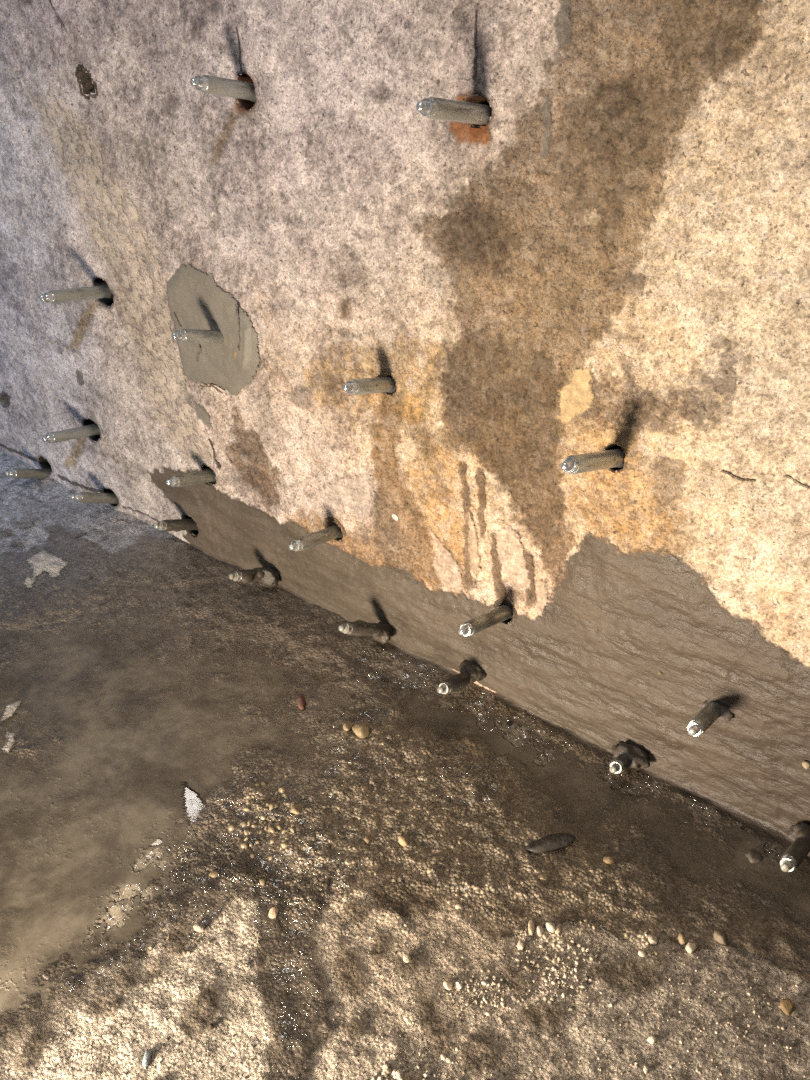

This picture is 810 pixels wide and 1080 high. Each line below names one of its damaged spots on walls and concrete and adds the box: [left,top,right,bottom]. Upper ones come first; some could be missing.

corrosion [450,121,490,145]
water stain [414,0,767,607]
corrosion [289,335,467,586]
water stain [370,394,441,591]
water stain [0,517,810,1080]